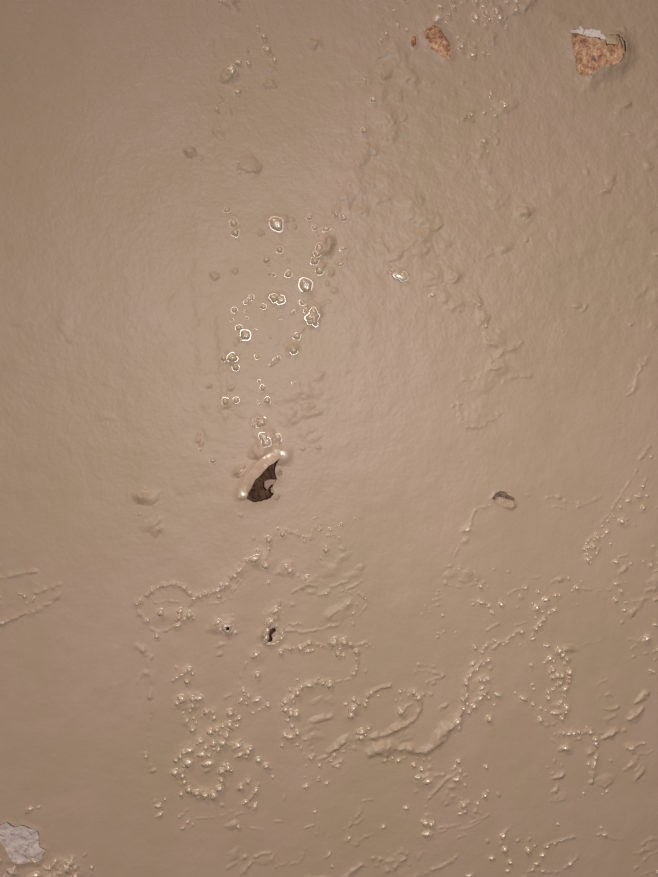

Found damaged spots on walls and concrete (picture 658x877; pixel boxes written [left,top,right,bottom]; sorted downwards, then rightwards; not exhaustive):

flaking render [406,19,458,67]
flaking render [552,14,640,97]
peeling [489,489,518,511]
peeling [0,805,94,877]